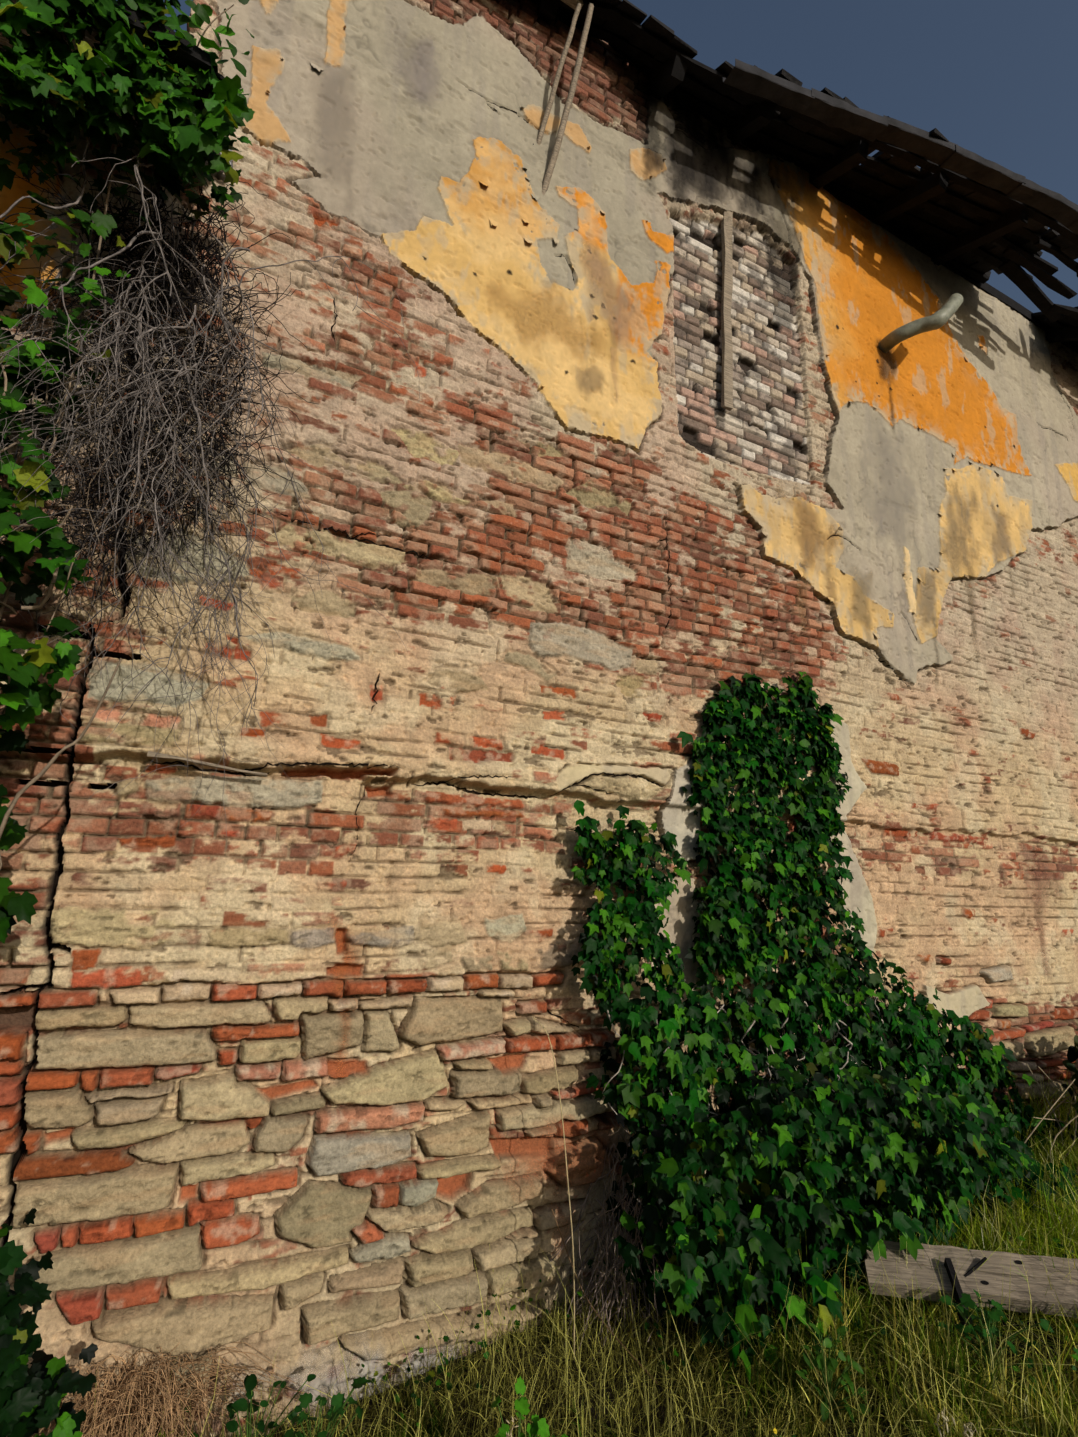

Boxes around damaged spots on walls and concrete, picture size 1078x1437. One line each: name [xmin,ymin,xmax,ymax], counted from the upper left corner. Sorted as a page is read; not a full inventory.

peeling [310,0,361,72]
peeling [241,45,292,147]
flaking render [404,0,667,181]
peeling [382,137,674,449]
peeling [740,157,1033,649]
peeling [1056,463,1078,501]
crack [276,512,439,560]
crack [372,673,380,708]
crack [3,397,141,1246]
crack [150,760,665,860]